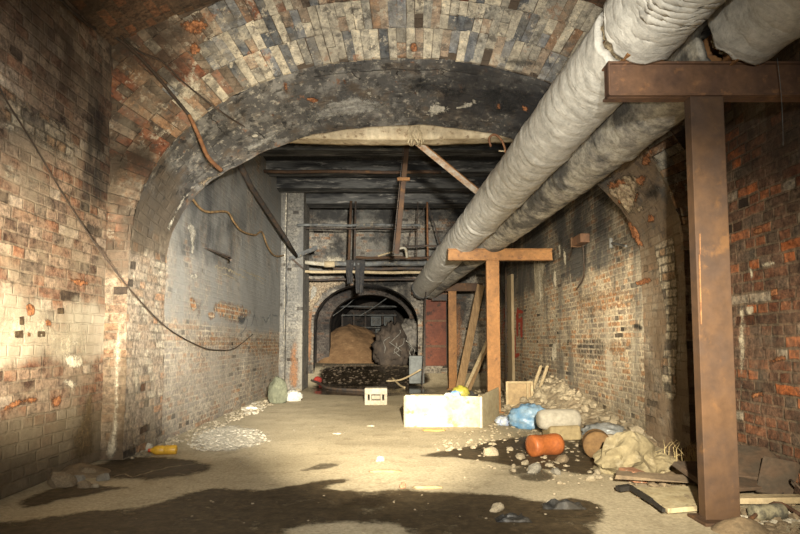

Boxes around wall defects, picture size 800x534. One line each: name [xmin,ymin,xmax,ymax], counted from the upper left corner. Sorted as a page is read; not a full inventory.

peeling [208,302,251,322]